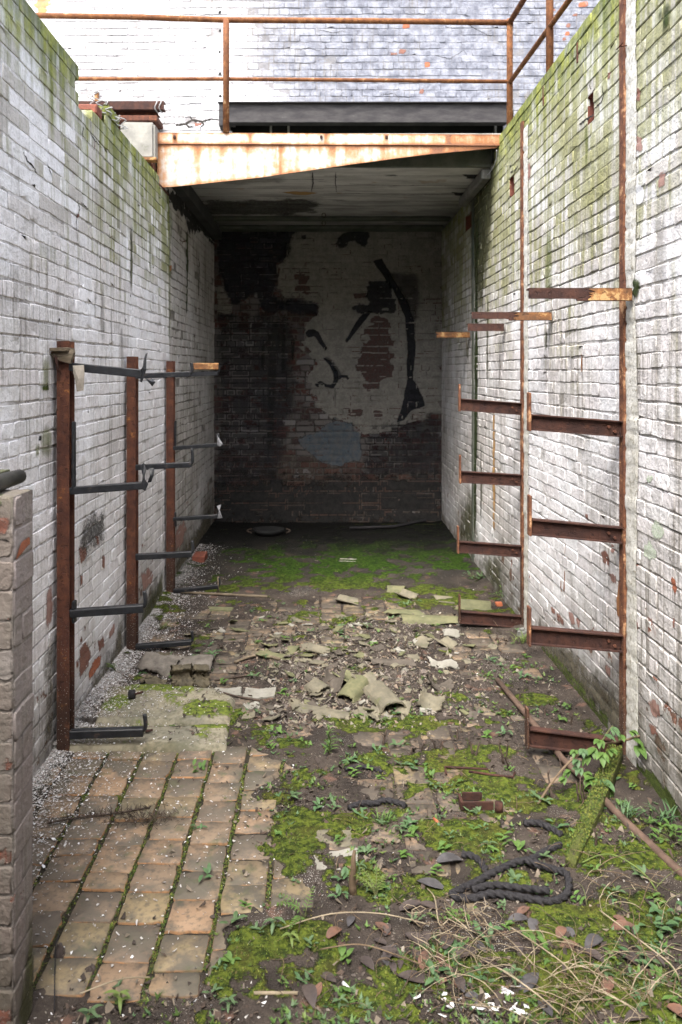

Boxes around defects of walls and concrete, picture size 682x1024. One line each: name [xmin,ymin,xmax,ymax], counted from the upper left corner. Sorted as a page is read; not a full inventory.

peeling [352,279,396,392]
water stain [78,507,106,560]